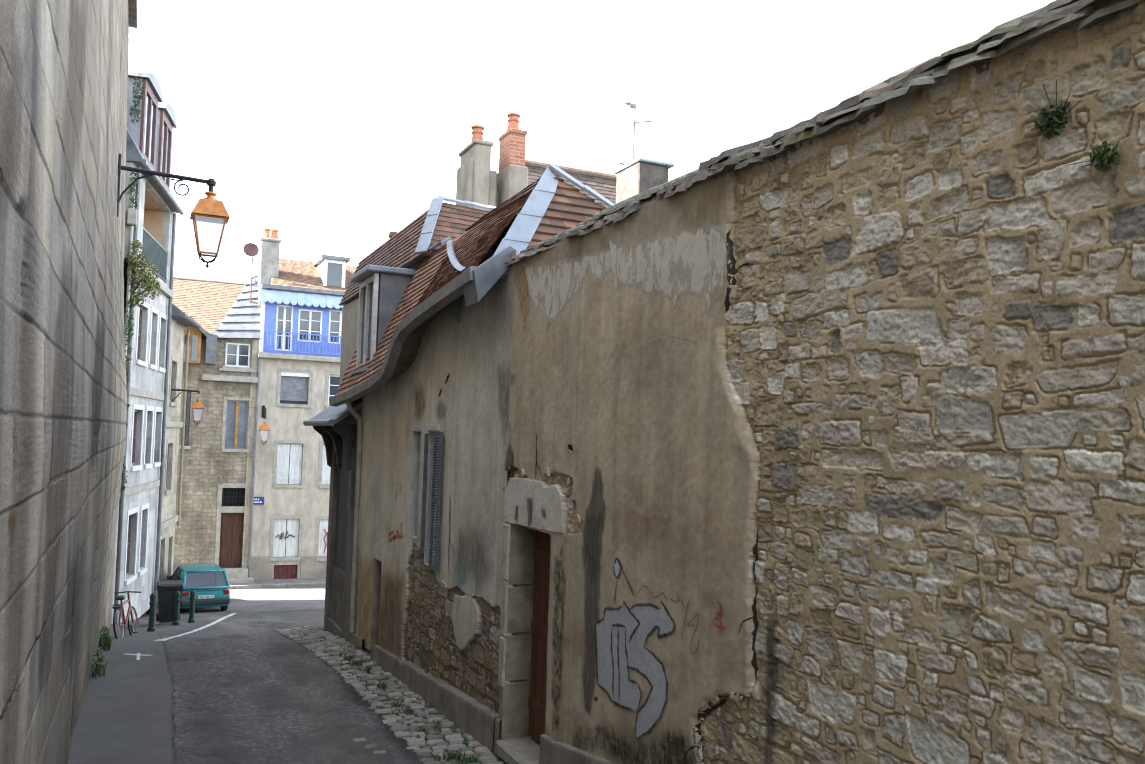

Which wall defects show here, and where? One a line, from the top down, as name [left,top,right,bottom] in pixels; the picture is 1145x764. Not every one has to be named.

spalling [542,467,584,535]
spalling [402,543,502,720]
spalling [693,685,763,764]